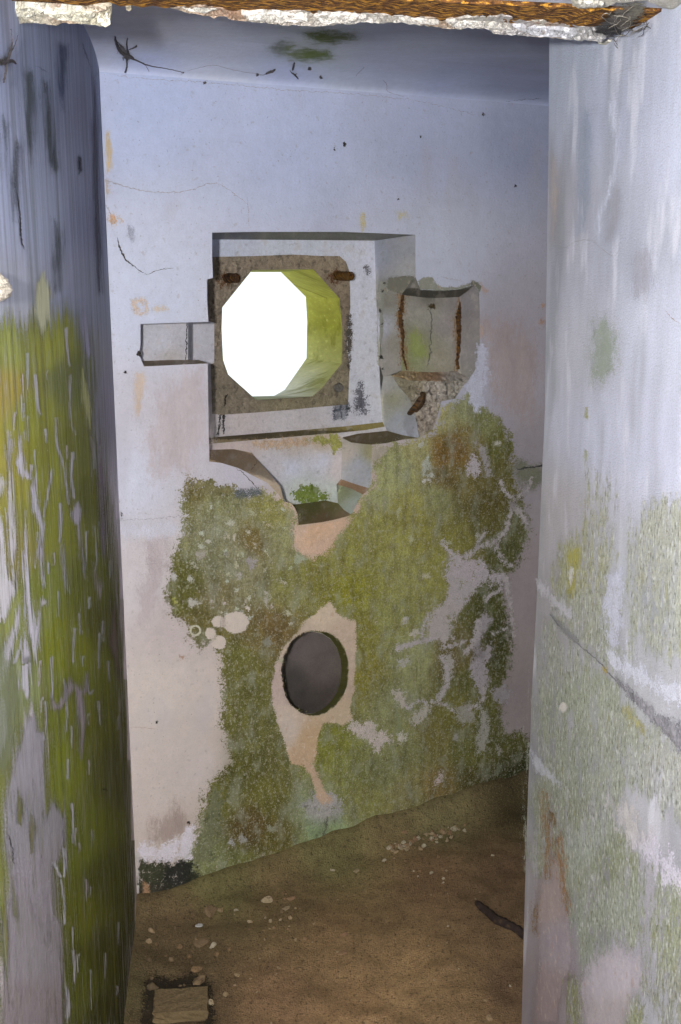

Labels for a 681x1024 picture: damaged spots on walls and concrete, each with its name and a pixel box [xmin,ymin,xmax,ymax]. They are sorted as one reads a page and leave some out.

peeling [15,1,112,28]
peeling [170,5,611,45]
peeling [571,0,681,9]
crack [109,210,171,275]
spalling [376,276,490,370]
damp [132,355,266,503]
mould [332,379,371,421]
damp [395,476,534,715]
damp [597,565,681,710]
efflorescence [346,719,409,754]
damp [529,746,562,786]
damp [604,793,681,902]